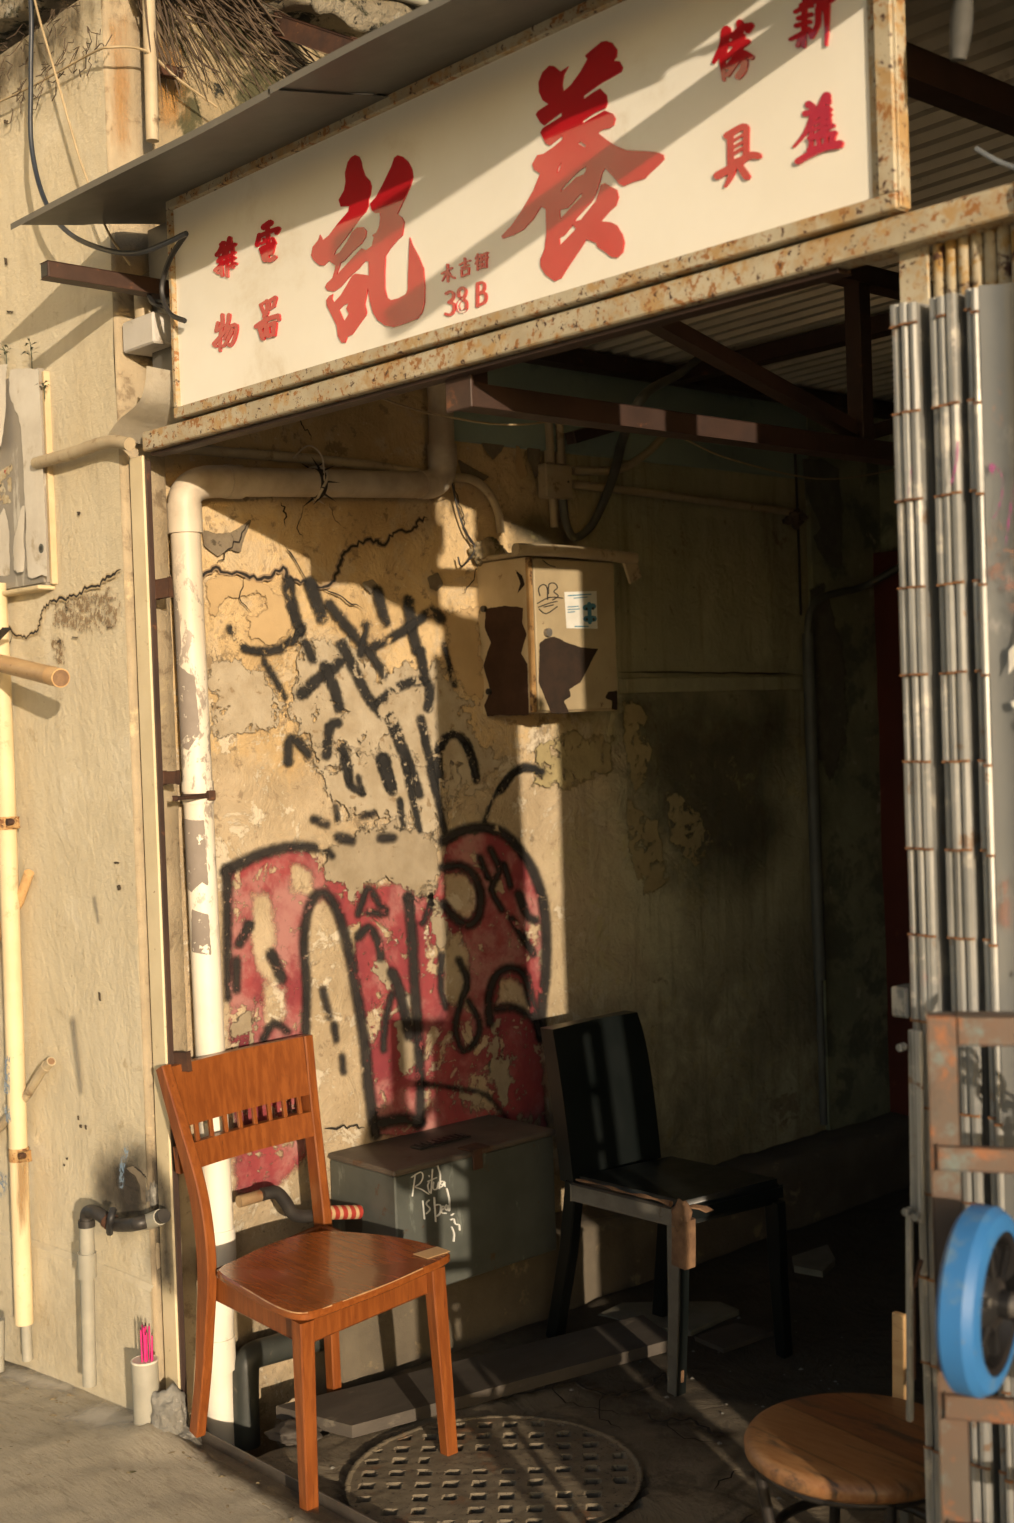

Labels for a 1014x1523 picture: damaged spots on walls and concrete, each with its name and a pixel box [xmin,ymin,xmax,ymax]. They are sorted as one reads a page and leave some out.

crack [9,569,121,644]
crack [169,484,478,611]
peeling [532,700,713,895]